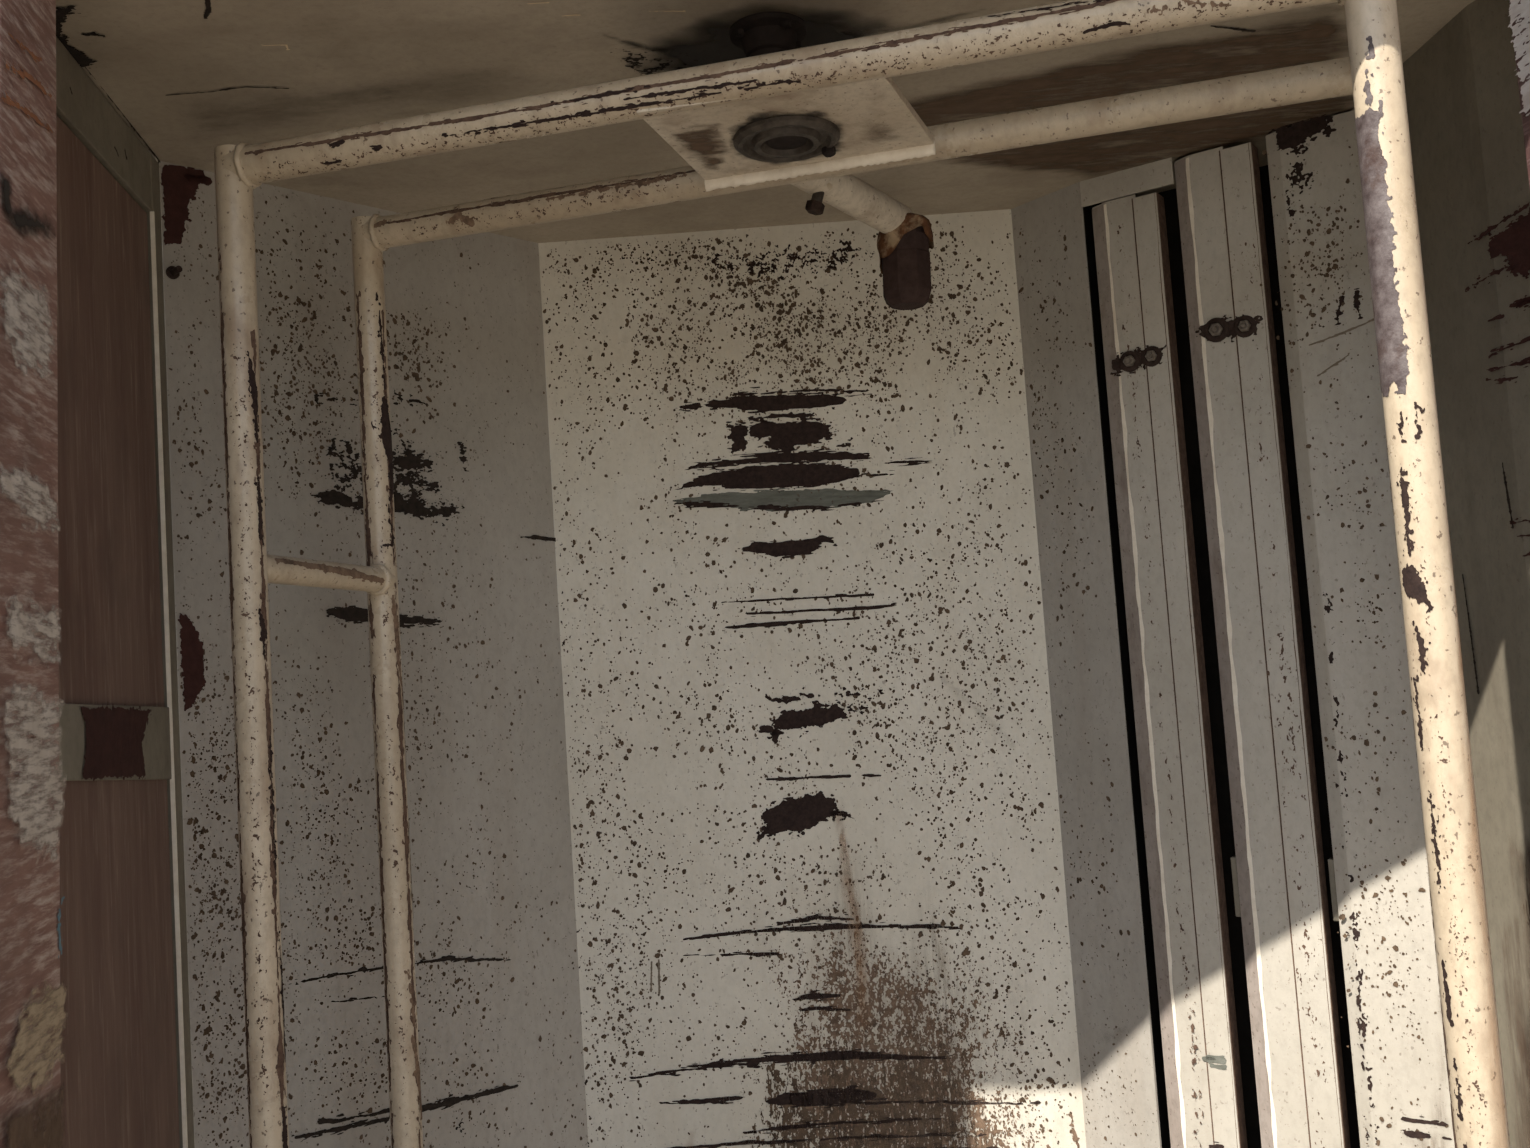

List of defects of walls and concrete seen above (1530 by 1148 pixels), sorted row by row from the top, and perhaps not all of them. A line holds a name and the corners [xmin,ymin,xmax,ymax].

peeling [1508,0,1530,116]
spalling [161,165,212,248]
peeling [1465,202,1530,292]
peeling [311,431,364,516]
peeling [371,292,465,549]
peeling [457,442,468,472]
peeling [679,399,703,412]
peeling [726,409,853,453]
peeling [177,613,208,711]
corrosion [250,195,1154,1148]
peeling [756,685,885,744]
peeling [753,791,852,844]